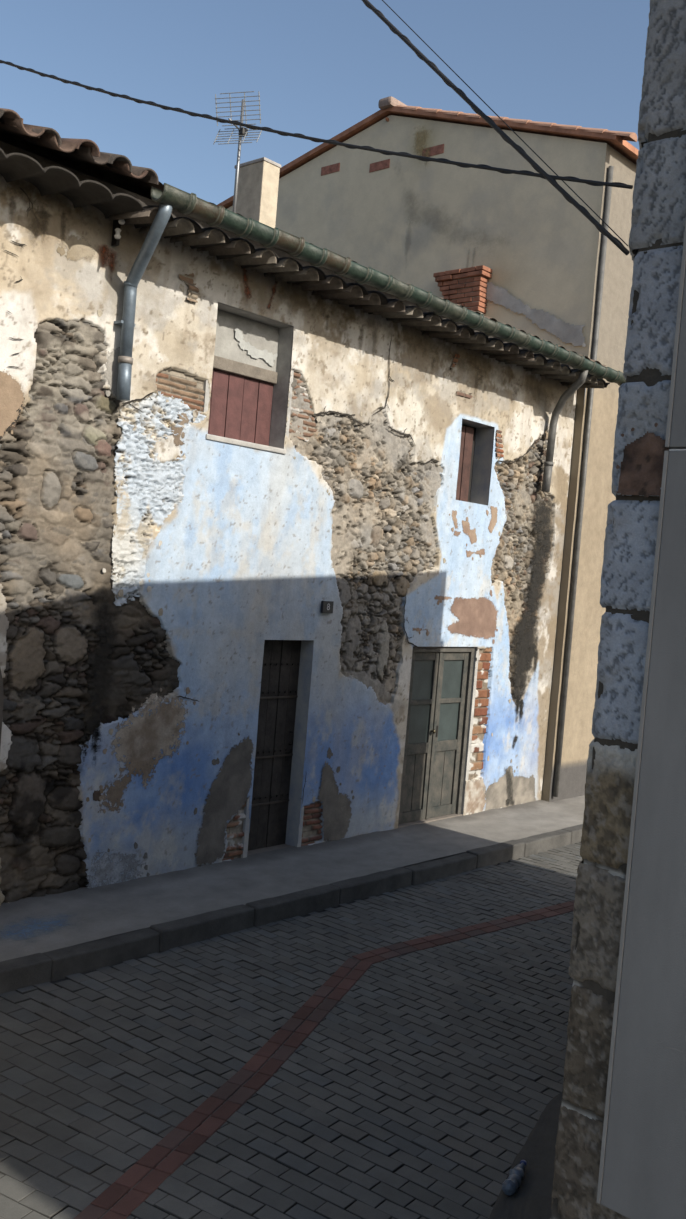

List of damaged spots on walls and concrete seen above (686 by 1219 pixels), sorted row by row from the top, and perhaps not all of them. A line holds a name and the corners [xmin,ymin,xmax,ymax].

peeling [102,366,206,606]
flaking render [289,359,321,446]
flaking render [495,430,505,459]
leakage [512,502,555,719]
peeling [86,687,196,814]
flaking render [434,590,536,815]
peeling [87,842,150,888]
flaking render [301,796,323,846]